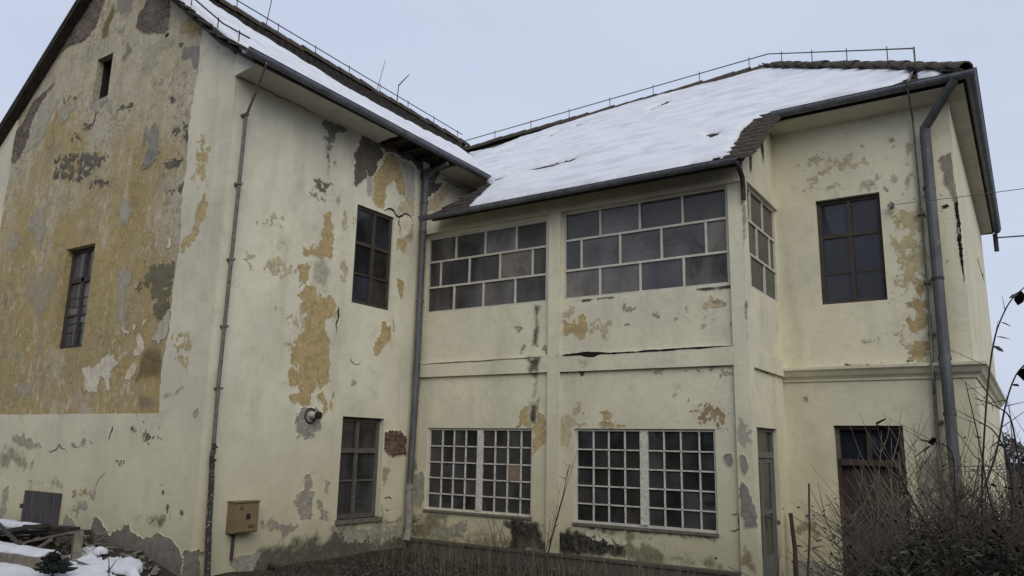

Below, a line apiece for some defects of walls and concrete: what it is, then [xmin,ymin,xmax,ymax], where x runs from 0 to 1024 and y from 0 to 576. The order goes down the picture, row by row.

flaking render [53,96,112,188]
flaking render [353,135,454,213]
peeling [793,144,874,192]
crack [385,208,412,229]
peeling [244,177,356,416]
crack [420,345,734,365]
peeling [561,298,636,341]
peeling [880,193,949,362]
flaking render [383,430,425,509]
flaking render [723,418,758,528]
flaking render [69,487,205,576]